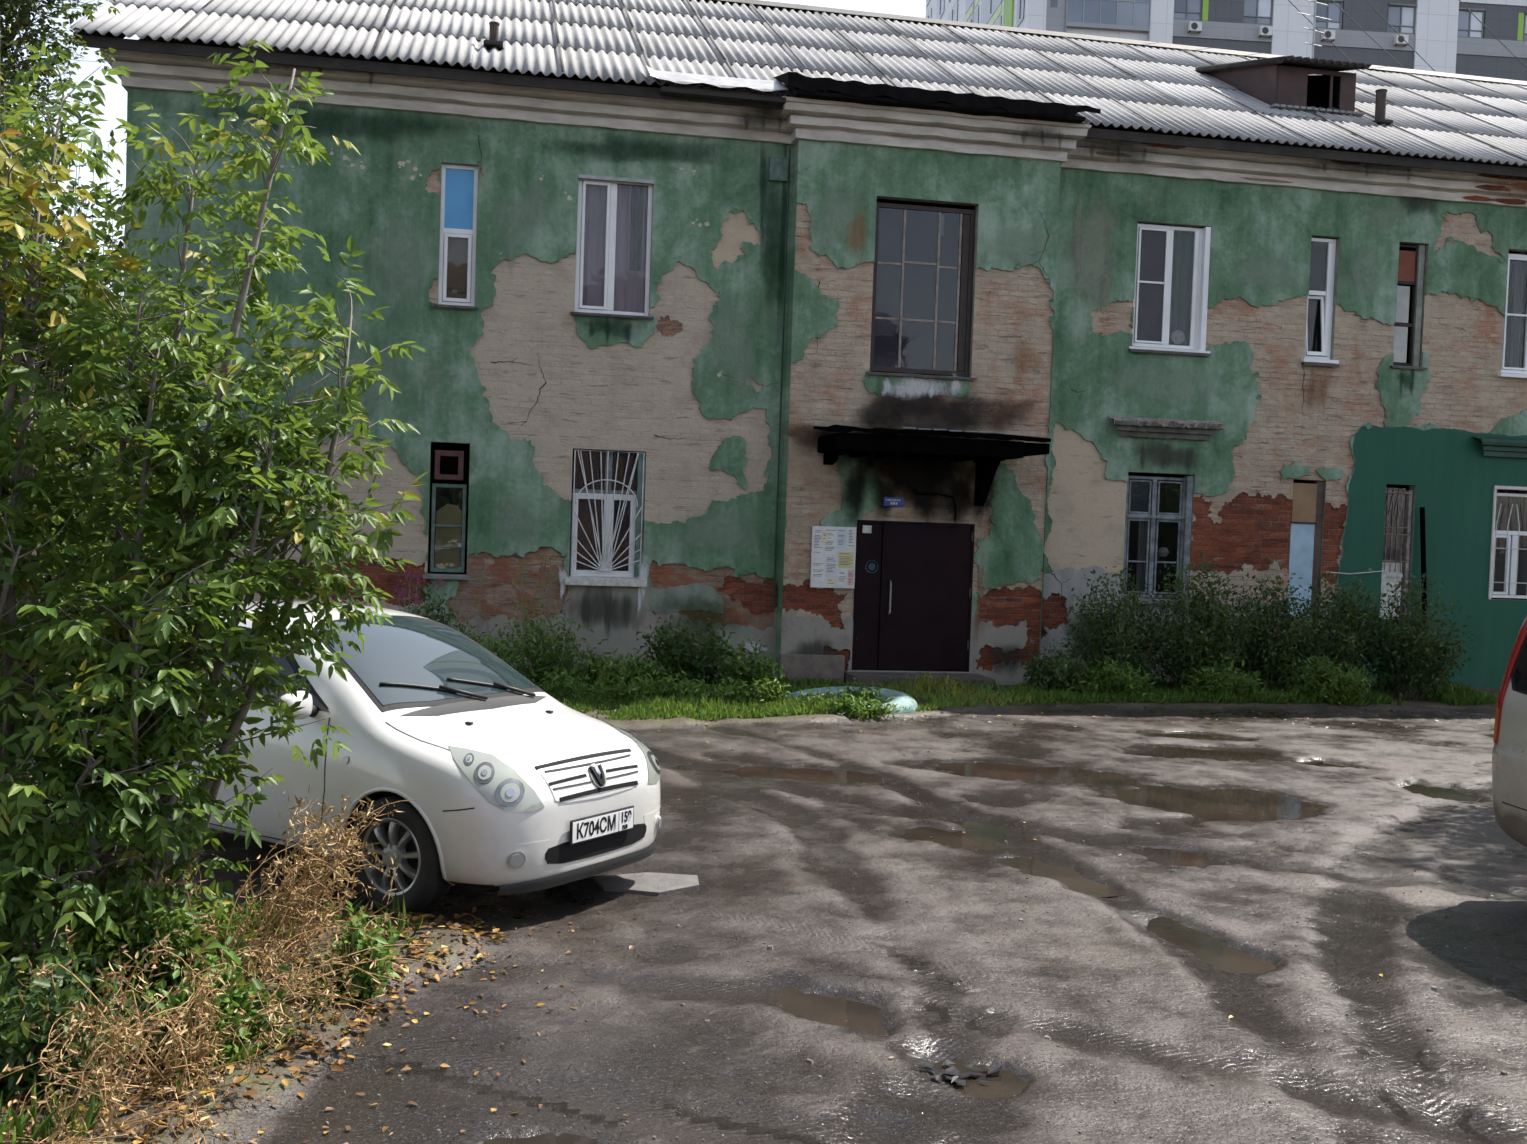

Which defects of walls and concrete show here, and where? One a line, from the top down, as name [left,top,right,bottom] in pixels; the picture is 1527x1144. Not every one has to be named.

peeling [1433,174,1527,262]
flaking render [427,279,438,303]
peeling [184,432,432,611]
crack [491,356,547,426]
peeling [445,203,1134,673]
water stain [845,456,993,519]
water stain [865,376,1029,428]
peeling [1189,295,1394,606]
peeling [1405,291,1527,433]